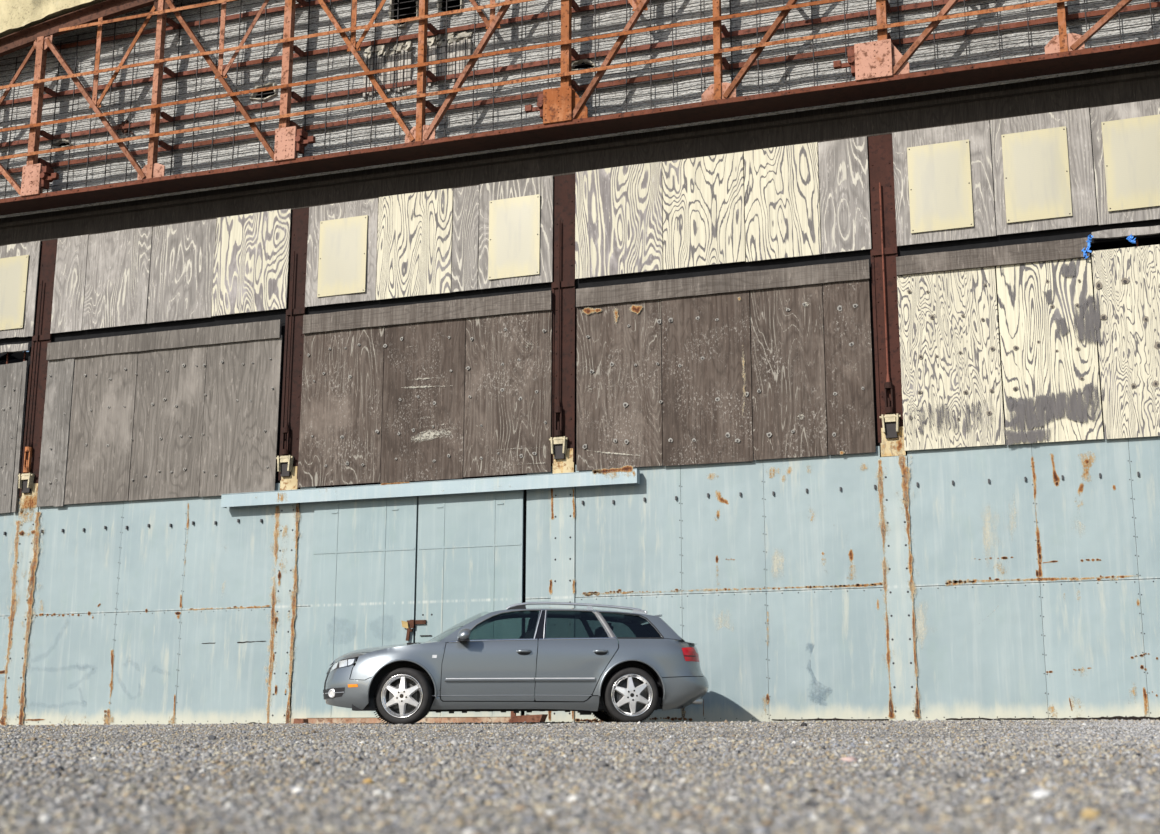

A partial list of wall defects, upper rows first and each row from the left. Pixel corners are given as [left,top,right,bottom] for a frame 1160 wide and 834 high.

rust [582,305,642,322]
rust [0,492,100,725]
rust [175,493,300,724]
rust [572,437,920,721]
rust [945,454,1131,600]